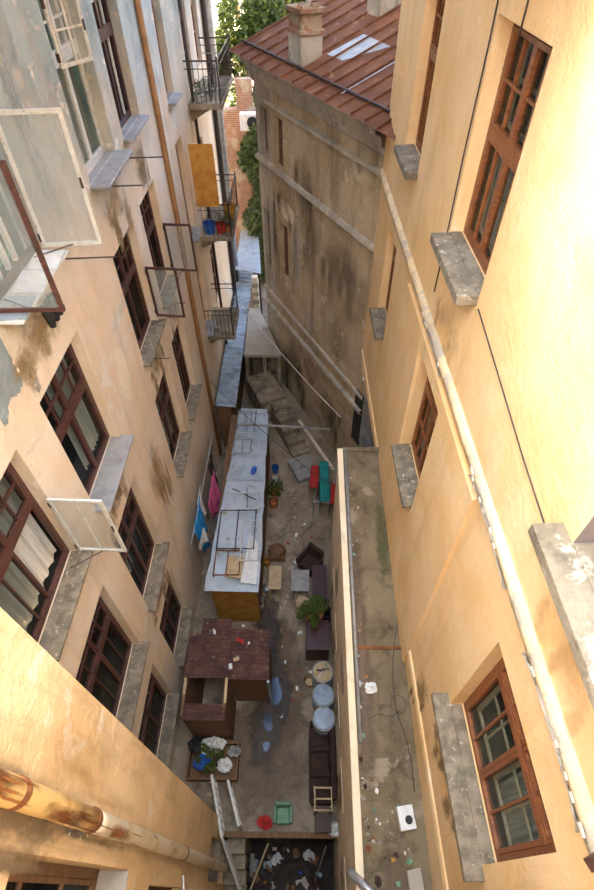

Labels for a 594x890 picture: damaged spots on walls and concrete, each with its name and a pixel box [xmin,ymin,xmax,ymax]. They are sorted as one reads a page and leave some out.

flaking render [0,338,42,426]
corrosion [0,775,36,805]